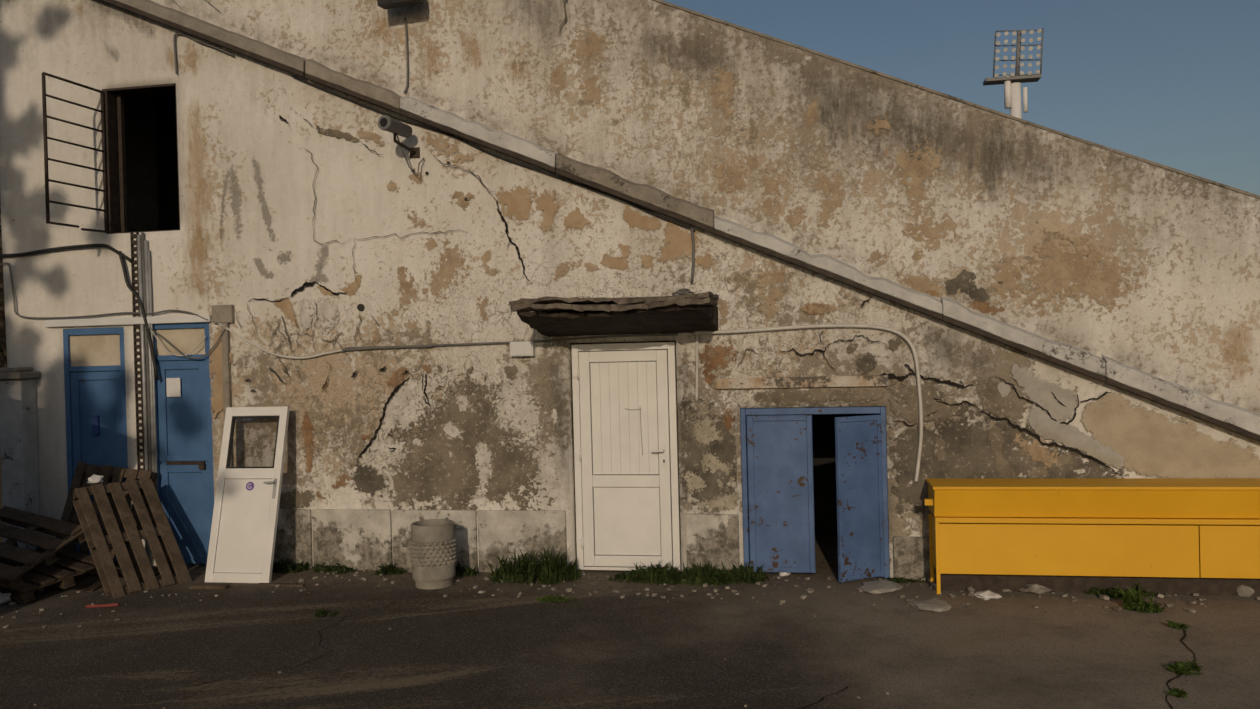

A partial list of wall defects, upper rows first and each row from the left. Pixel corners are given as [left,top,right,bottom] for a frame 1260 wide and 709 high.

peeling [387,168,426,193]
peeling [450,191,475,211]
crack [434,156,527,278]
peeling [496,181,592,234]
peeling [551,205,713,281]
crack [235,115,465,463]
spalling [889,335,902,353]
crack [738,297,1123,478]
spalling [350,362,561,511]
spalling [754,343,1260,519]
spalling [280,488,316,509]